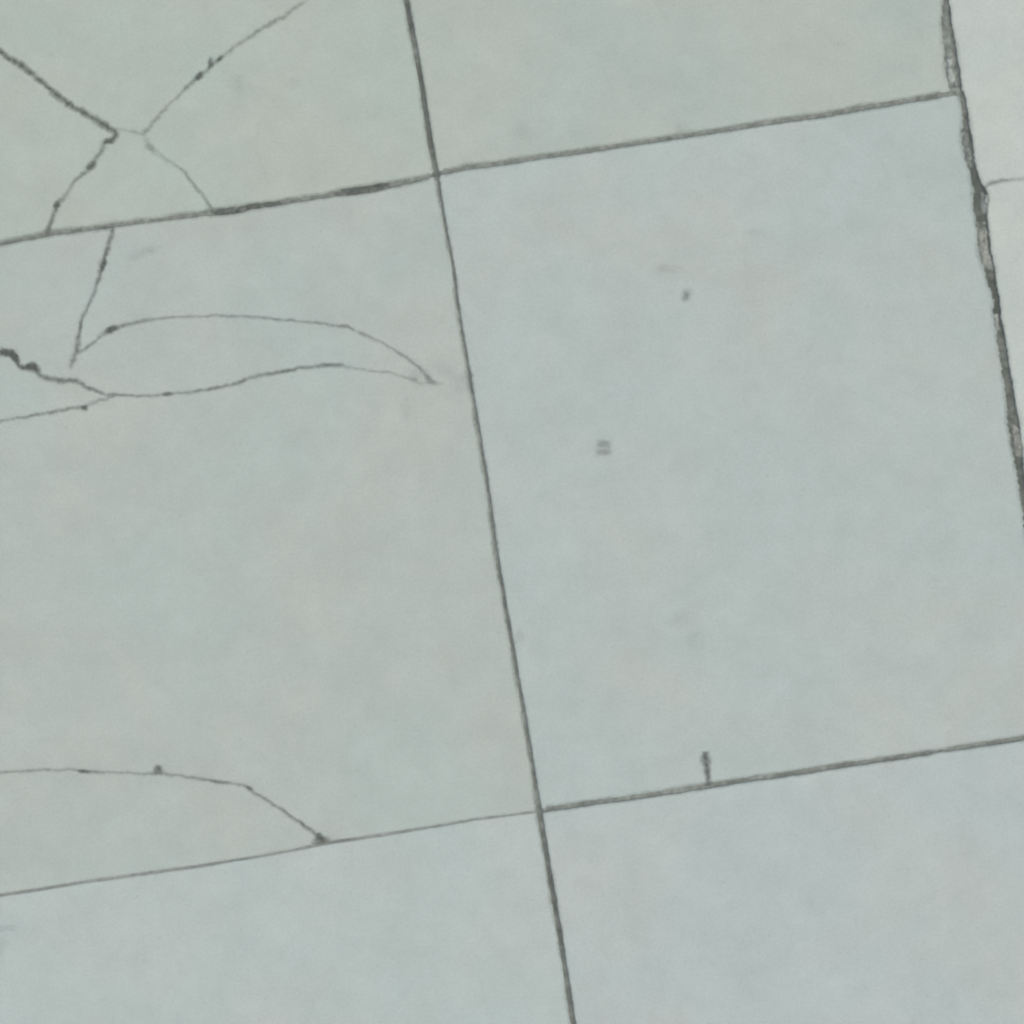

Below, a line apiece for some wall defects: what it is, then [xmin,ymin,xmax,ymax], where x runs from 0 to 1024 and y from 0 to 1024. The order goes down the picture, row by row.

crack [0,51,117,139]
crack [1,349,91,410]